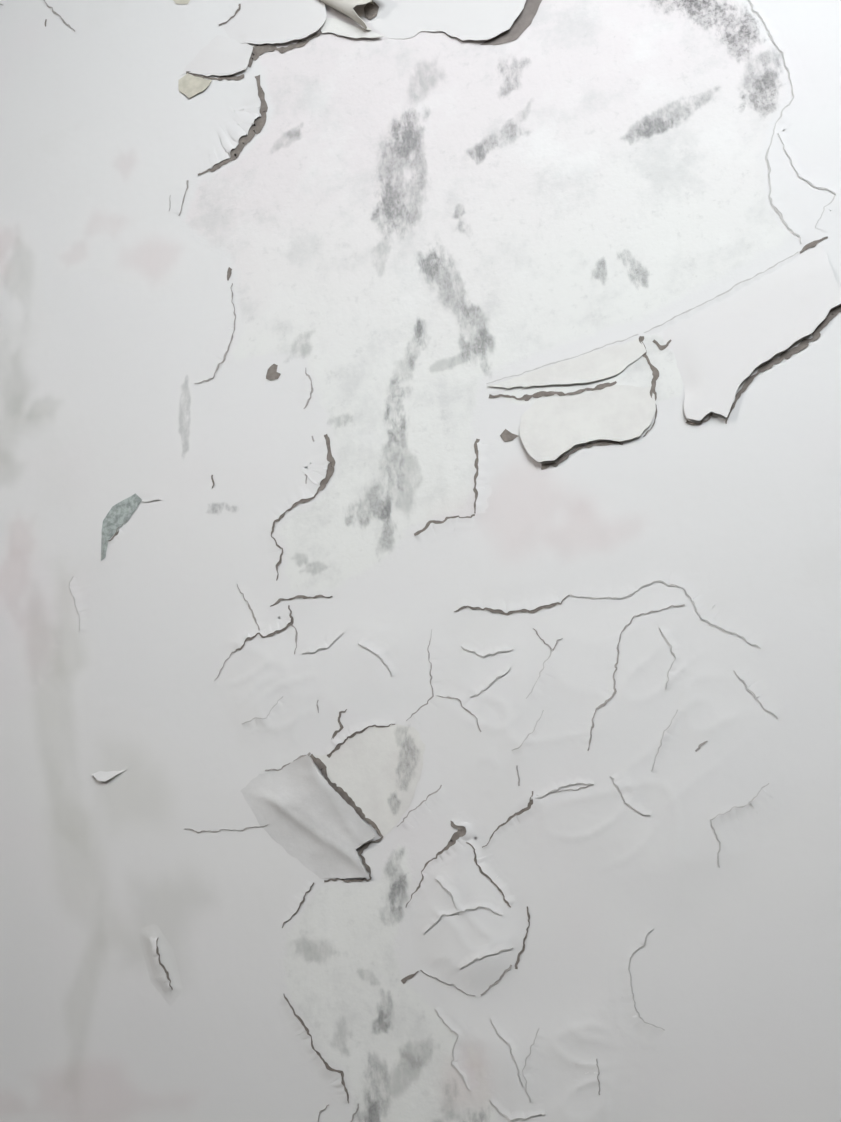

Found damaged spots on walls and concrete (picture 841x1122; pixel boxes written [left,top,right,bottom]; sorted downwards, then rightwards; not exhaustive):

crack [193,267,236,384]
crack [286,368,313,409]
peeling [178,0,841,599]
crack [489,381,617,401]
crack [541,336,672,470]
crack [686,305,841,425]
spalling [101,492,160,561]
crack [186,825,268,833]
crack [214,434,793,1122]
crack [147,936,173,992]
peeling [241,724,504,1122]